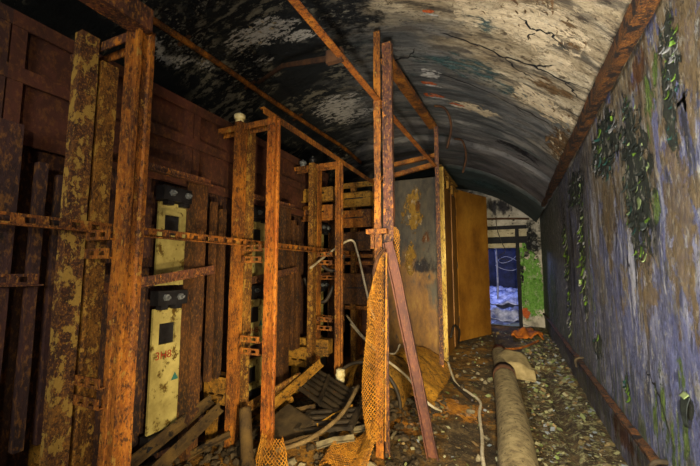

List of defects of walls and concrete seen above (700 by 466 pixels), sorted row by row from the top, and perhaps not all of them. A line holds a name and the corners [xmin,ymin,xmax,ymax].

peeling [155,36,215,71]
peeling [223,16,316,56]
peeling [311,93,373,125]
peeling [420,68,500,117]
crack [395,48,560,134]
crack [443,33,590,97]
peeling [446,0,596,80]
crack [519,17,564,48]
peeling [512,82,576,161]
corrosion [628,37,647,96]
leakage [621,0,700,466]